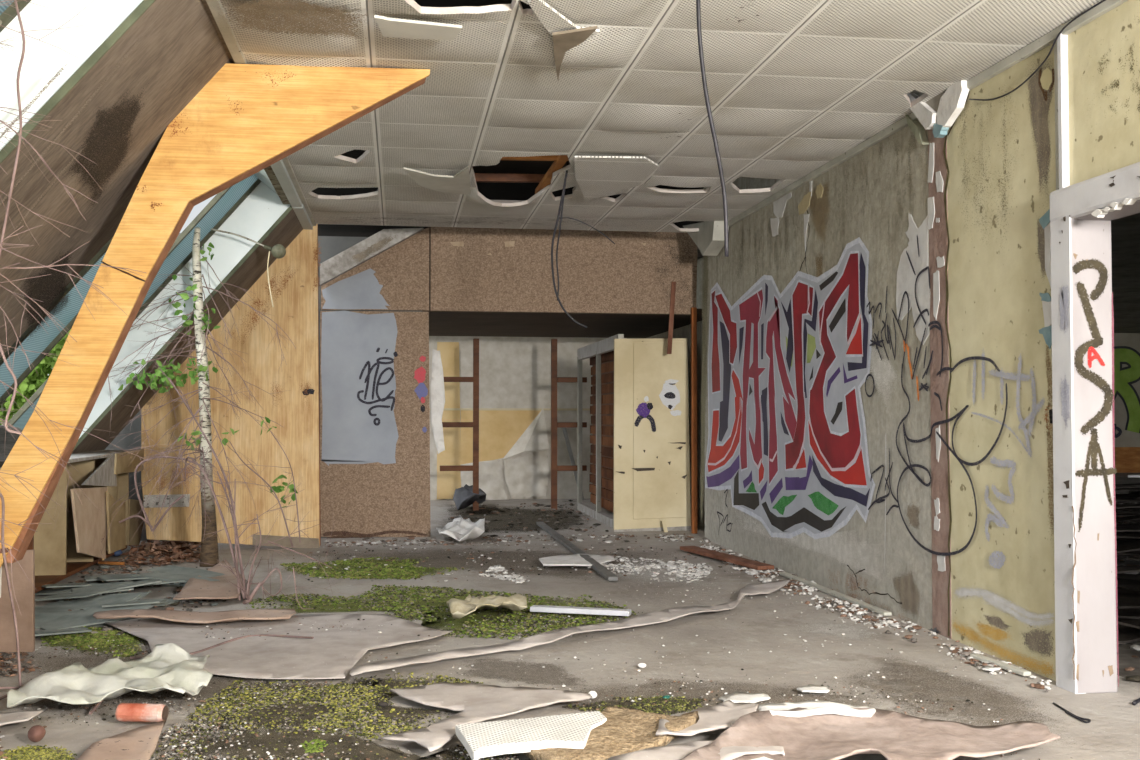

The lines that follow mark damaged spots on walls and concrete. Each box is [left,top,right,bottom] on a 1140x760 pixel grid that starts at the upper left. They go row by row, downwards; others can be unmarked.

damp [218,0,369,39]
peeling [896,80,970,345]
damp [956,50,1055,284]
peeling [937,555,945,572]